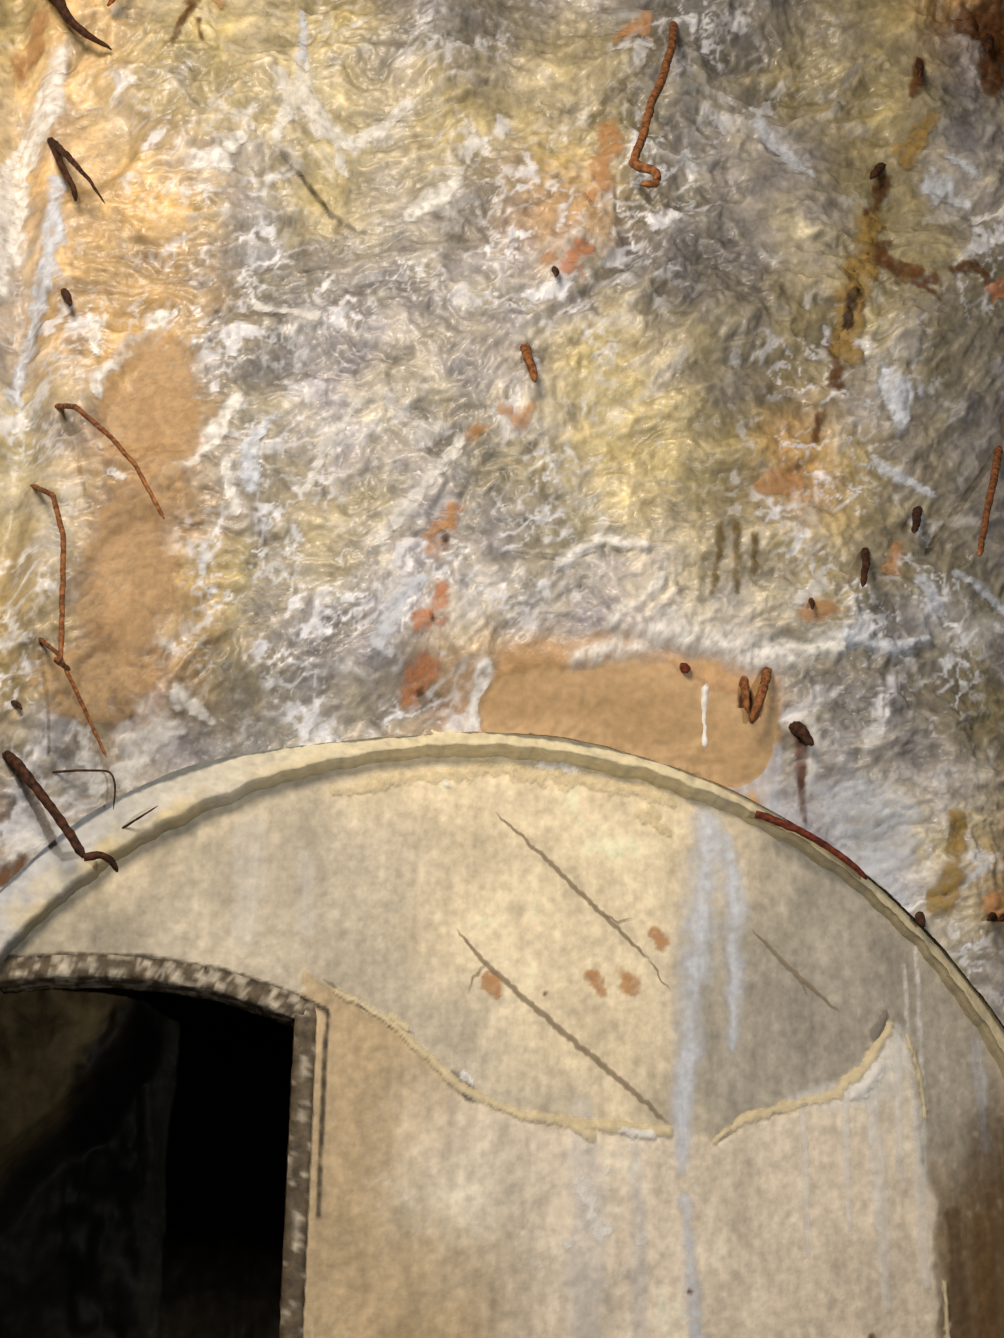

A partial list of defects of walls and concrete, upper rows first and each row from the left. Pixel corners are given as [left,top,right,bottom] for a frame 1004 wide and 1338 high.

corrosion [950,0,1004,96]
corrosion [99,330,215,517]
corrosion [30,612,163,722]
corrosion [796,737,807,821]
corrosion [0,854,26,886]
crack [500,817,667,985]
flaking render [334,989,672,1141]
crack [461,934,662,1118]
corrosion [586,970,636,995]
leakage [674,810,746,1171]
flaking render [712,1010,927,1142]
flaking render [942,1281,950,1338]